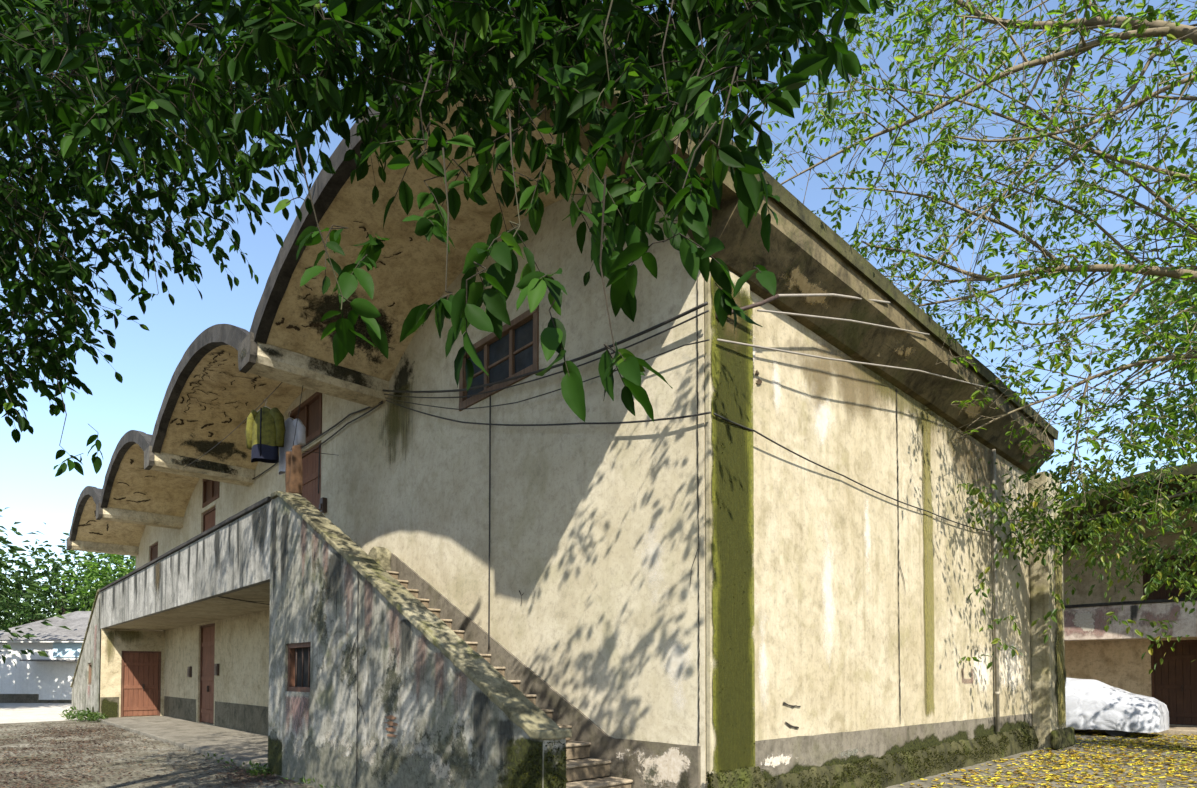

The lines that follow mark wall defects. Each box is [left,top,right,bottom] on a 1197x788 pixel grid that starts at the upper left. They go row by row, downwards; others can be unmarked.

spalling [789,266,827,304]
leakage [299,292,415,444]
leakage [172,436,247,475]
leakage [101,506,288,607]
leakage [303,552,343,641]
peeling [1064,607,1118,636]
leakage [316,643,366,697]
leakage [368,619,513,788]
spalling [269,715,509,788]
spalling [616,747,690,787]